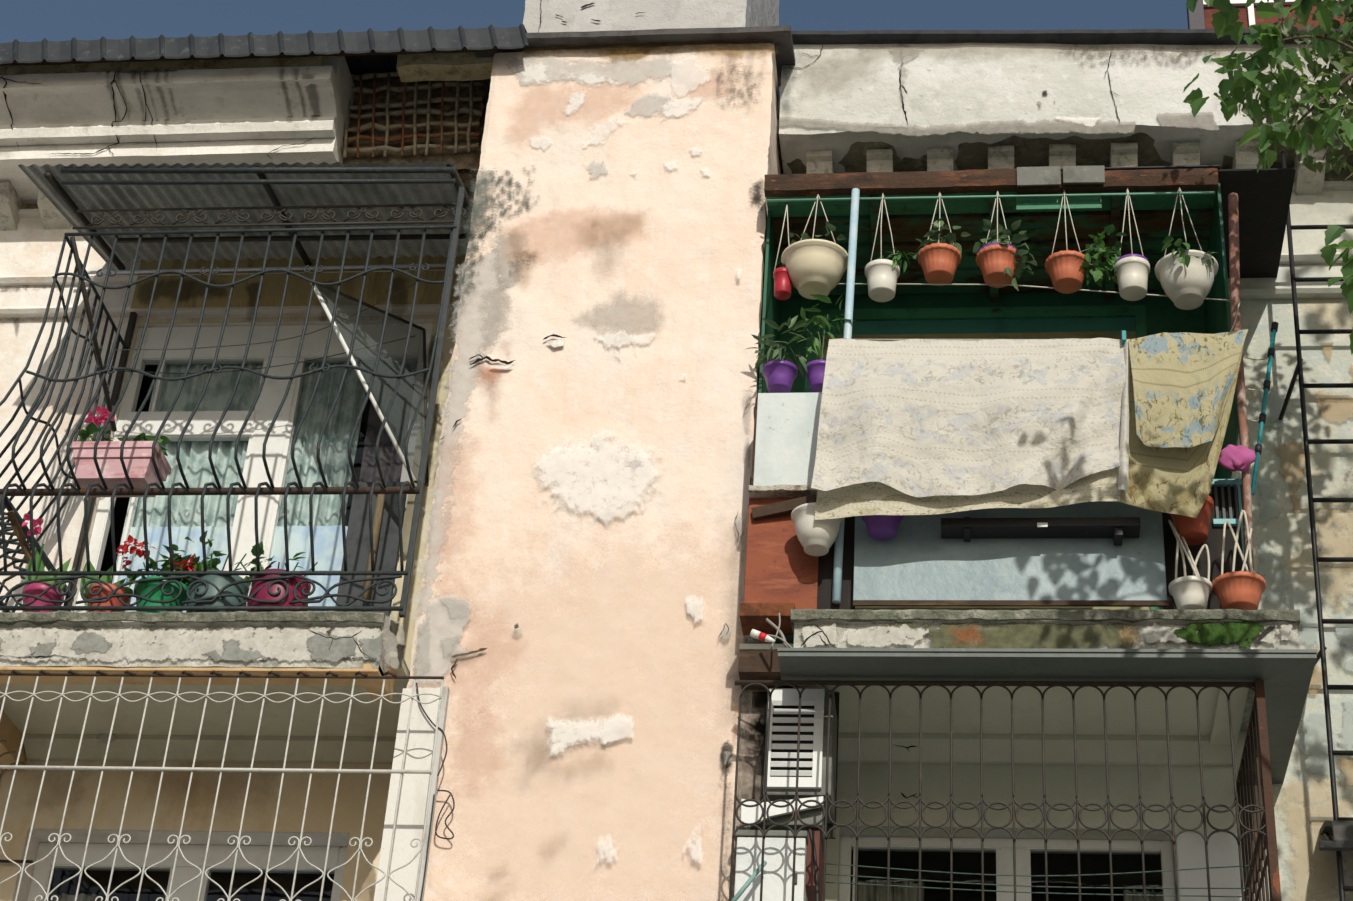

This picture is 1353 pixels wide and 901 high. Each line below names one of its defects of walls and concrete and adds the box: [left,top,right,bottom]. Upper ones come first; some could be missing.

peeling [508,55,709,97]
crack [899,63,908,124]
crack [1105,50,1122,136]
leakage [454,170,530,315]
flaking render [595,331,655,357]
peeling [1260,386,1287,427]
peeling [0,235,525,683]
peeling [1258,508,1353,671]
peeling [801,624,929,648]
peeling [1143,623,1198,643]
peeling [1278,698,1353,901]